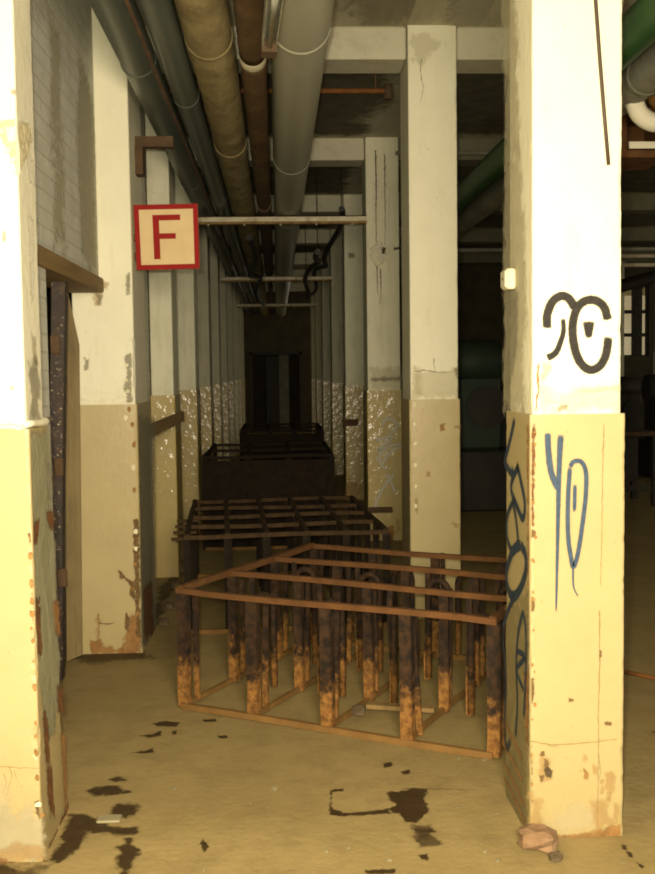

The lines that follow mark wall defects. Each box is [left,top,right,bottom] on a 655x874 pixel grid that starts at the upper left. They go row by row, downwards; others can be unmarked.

spalling [118,519,141,638]